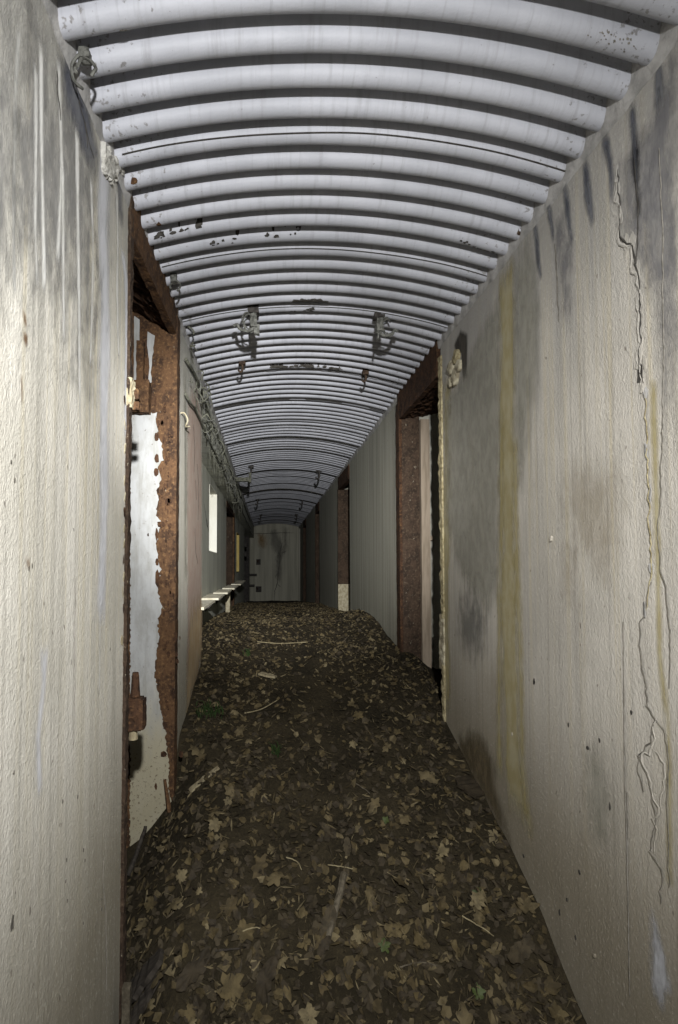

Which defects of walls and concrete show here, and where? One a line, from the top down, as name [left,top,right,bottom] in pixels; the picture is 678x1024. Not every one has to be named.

peeling [154,217,203,240]
peeling [210,226,301,246]
water stain [548,189,572,298]
water stain [583,163,593,222]
water stain [603,66,675,335]
peeling [134,316,155,383]
peeling [121,395,183,846]
water stain [443,226,541,824]
crack [623,148,671,996]